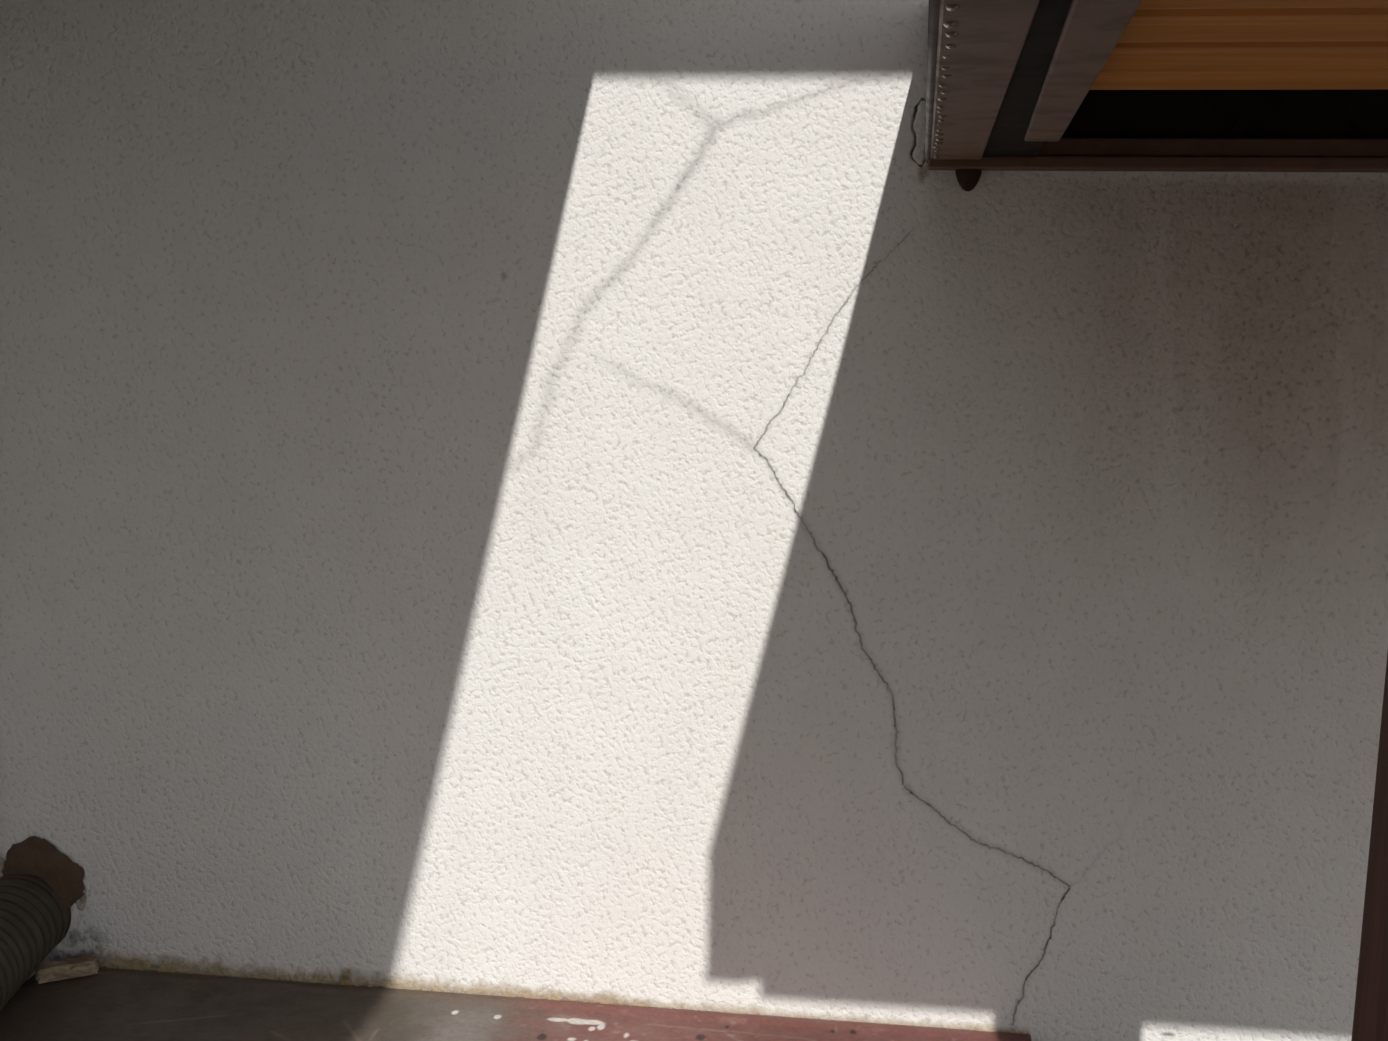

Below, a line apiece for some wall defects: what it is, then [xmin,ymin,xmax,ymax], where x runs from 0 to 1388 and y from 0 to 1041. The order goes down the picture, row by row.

crack [755,395,897,735]
crack [985,844,1070,1015]